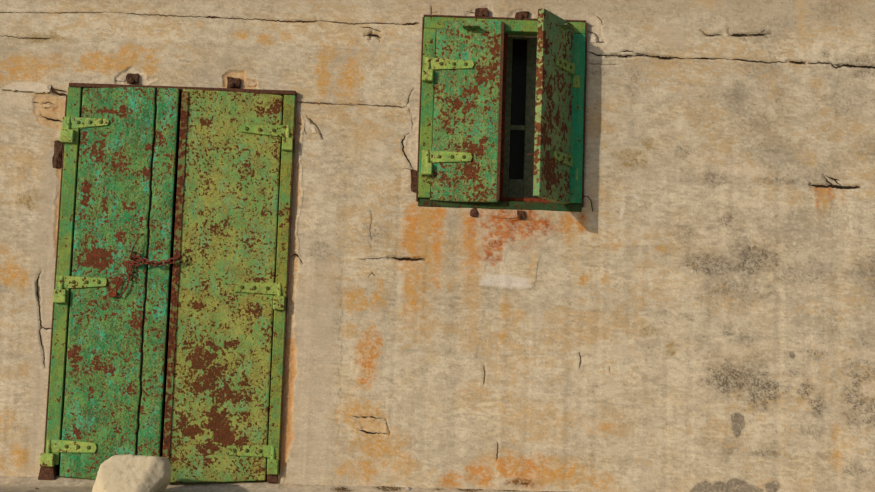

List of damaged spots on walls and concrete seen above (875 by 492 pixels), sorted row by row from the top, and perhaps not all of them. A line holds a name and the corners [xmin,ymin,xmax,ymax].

crack [0,7,434,42]
crack [587,16,875,69]
flaking render [1,82,68,141]
flaking render [51,165,61,260]
rust [393,14,590,345]
crack [809,175,859,189]
water stain [649,211,875,309]
crack [37,272,51,366]
rust [351,315,386,395]
water stain [683,314,875,479]
rust [436,446,552,492]
mould [688,476,782,492]